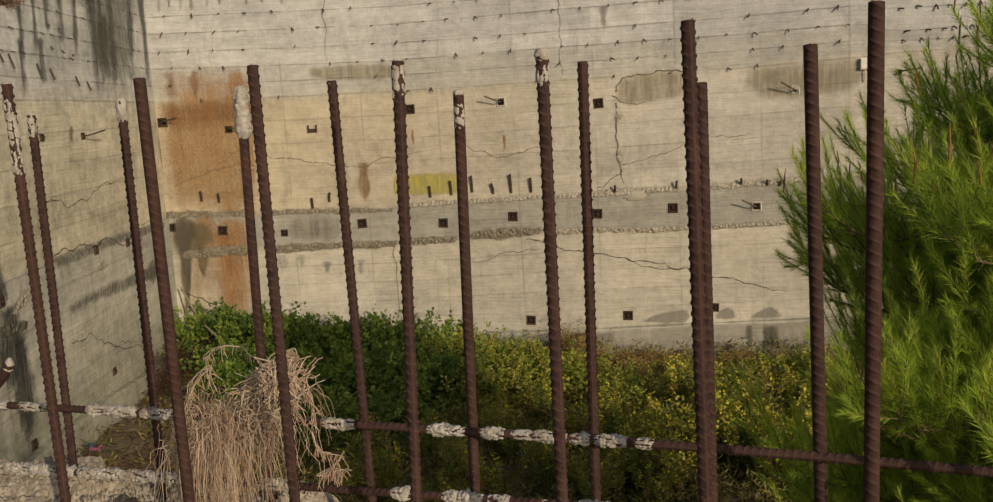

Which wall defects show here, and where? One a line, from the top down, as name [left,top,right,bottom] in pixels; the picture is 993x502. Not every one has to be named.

leakage [18,0,149,83]
crack [597,69,698,188]
crack [476,238,689,270]
crack [712,276,787,292]
leakage [0,270,34,438]